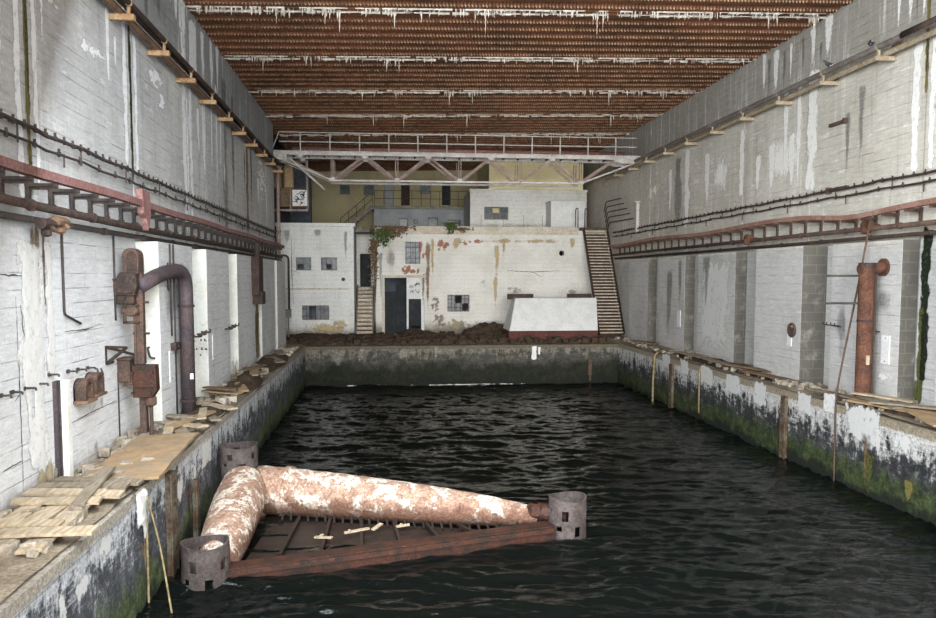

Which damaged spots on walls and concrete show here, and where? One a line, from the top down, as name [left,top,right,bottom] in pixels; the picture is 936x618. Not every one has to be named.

damp [898,0,926,27]
damp [12,0,25,163]
damp [30,0,43,168]
damp [910,35,936,173]
peeling [16,238,58,483]
peeling [700,365,713,386]
peeling [725,374,740,395]
peeling [753,381,767,407]
peeling [798,392,812,416]
peeling [823,393,881,455]
peeling [894,430,913,454]